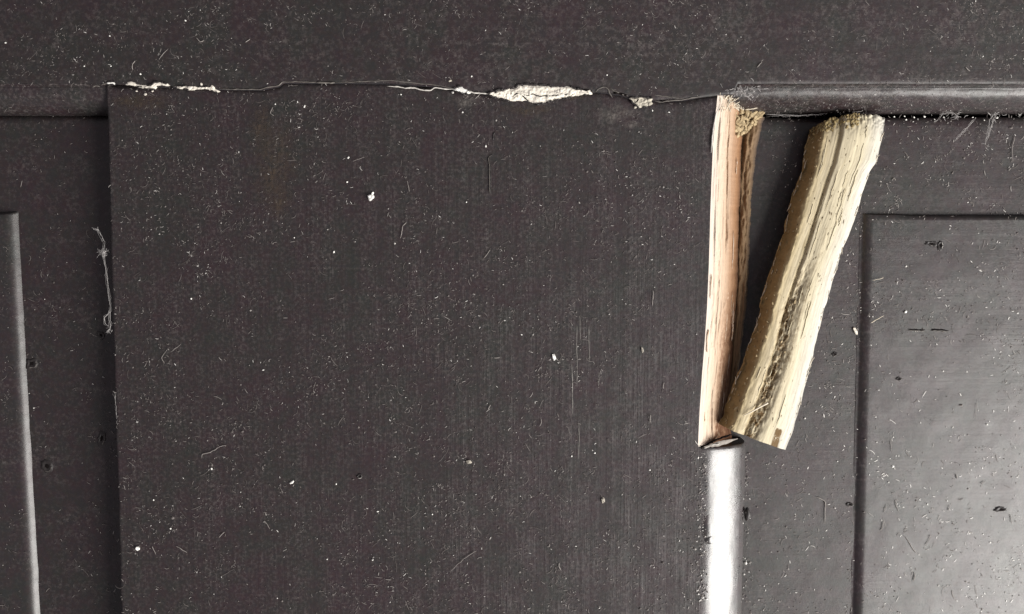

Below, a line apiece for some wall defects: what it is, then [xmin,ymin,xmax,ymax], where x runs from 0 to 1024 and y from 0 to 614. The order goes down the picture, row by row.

crack [93,82,139,90]
crack [227,80,487,94]
peeling [487,83,592,106]
crack [581,87,628,97]
crack [656,95,701,103]